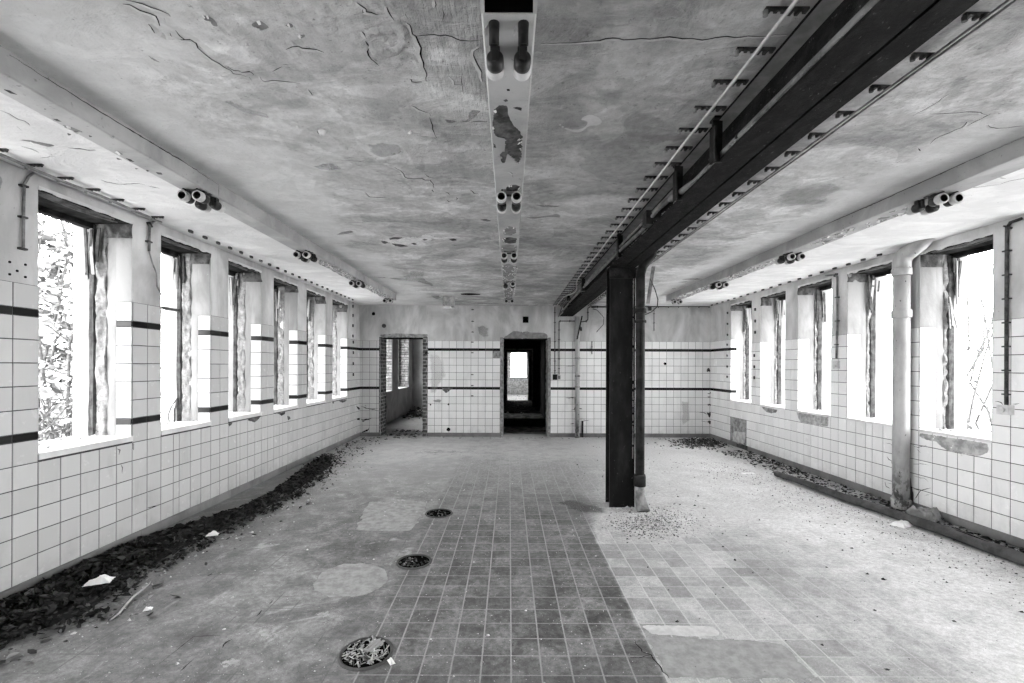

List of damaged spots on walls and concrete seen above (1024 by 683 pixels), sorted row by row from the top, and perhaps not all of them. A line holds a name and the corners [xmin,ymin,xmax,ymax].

peeling [252,21,269,30]
crack [123,0,324,95]
crack [540,34,787,45]
crack [355,0,483,142]
peeling [492,89,523,164]
spalling [730,418,745,445]
spalling [919,433,988,456]